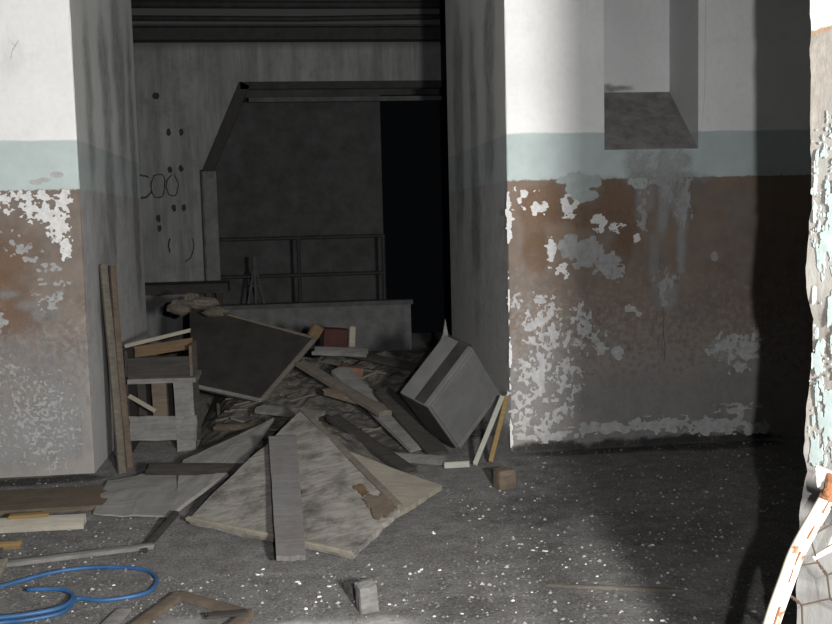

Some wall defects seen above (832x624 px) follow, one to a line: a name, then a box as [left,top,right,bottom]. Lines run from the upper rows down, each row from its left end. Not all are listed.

peeling [0,171,73,313]
peeling [505,187,549,244]
peeling [556,171,601,219]
flaking render [544,212,626,282]
peeling [628,165,693,243]
peeling [808,111,832,467]
peeling [506,289,770,448]